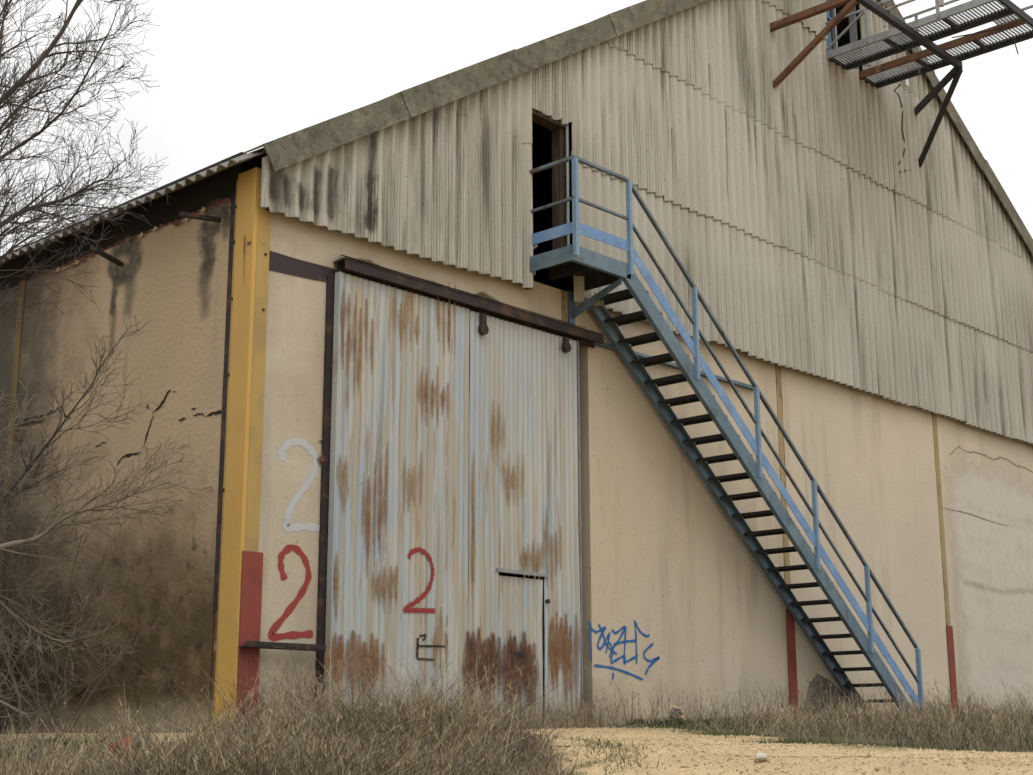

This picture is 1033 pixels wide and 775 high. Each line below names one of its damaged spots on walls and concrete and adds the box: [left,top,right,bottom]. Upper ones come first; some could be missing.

water stain [201,201,230,307]
crack [15,406,80,442]
crack [95,390,222,465]
rust [420,368,449,424]
rust [492,400,525,507]
rust [325,550,385,708]
rust [434,612,448,668]
rust [463,455,539,718]
rust [523,506,562,589]
rust [550,612,582,728]